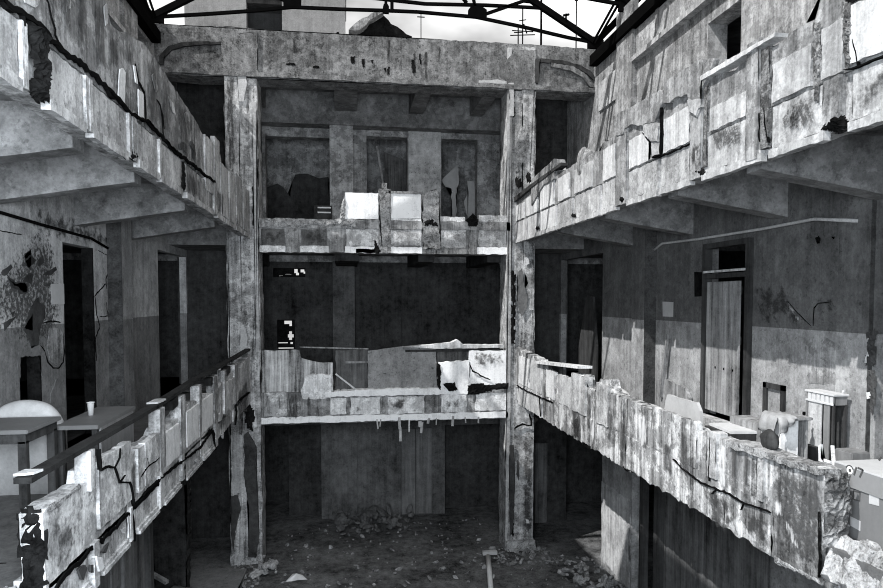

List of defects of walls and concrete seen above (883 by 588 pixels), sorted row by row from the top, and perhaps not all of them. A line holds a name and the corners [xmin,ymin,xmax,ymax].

spalling [26,20,53,105]
crack [0,0,216,183]
peeling [2,249,64,378]
spalling [4,484,81,588]
crack [54,430,217,588]
crack [672,437,771,513]
spalling [774,469,883,588]